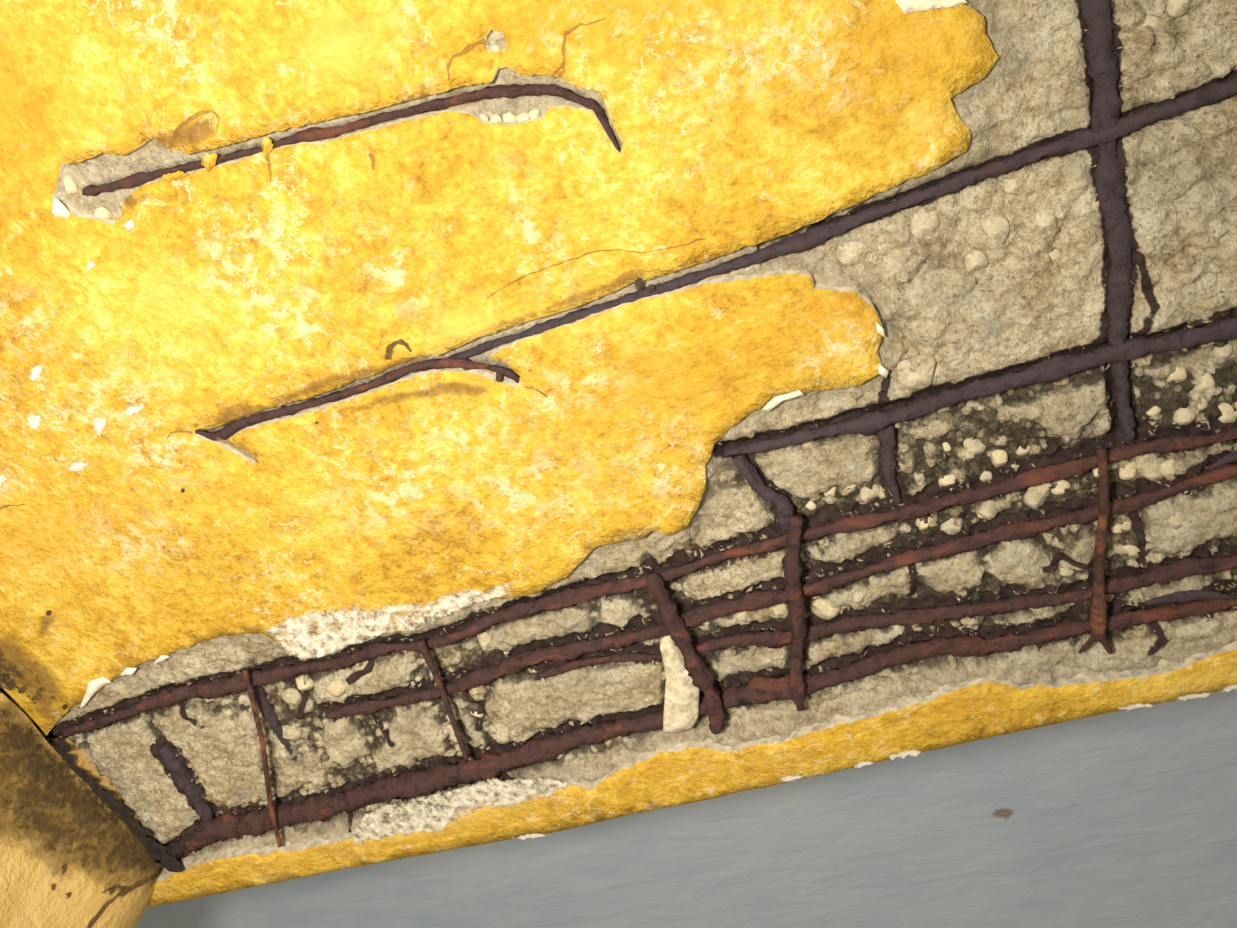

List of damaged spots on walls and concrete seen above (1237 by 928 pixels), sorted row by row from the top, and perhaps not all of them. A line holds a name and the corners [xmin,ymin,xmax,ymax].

spalling [51,67,623,232]
peeling [27,415,41,429]
peeling [30,366,43,381]
peeling [68,462,89,471]
peeling [94,417,107,435]
peeling [125,404,144,415]
rust [51,0,1237,748]
spalling [195,0,1237,696]
leakage [0,643,161,899]
crack [49,737,203,928]
rust [149,699,665,861]
spalling [56,590,1237,858]